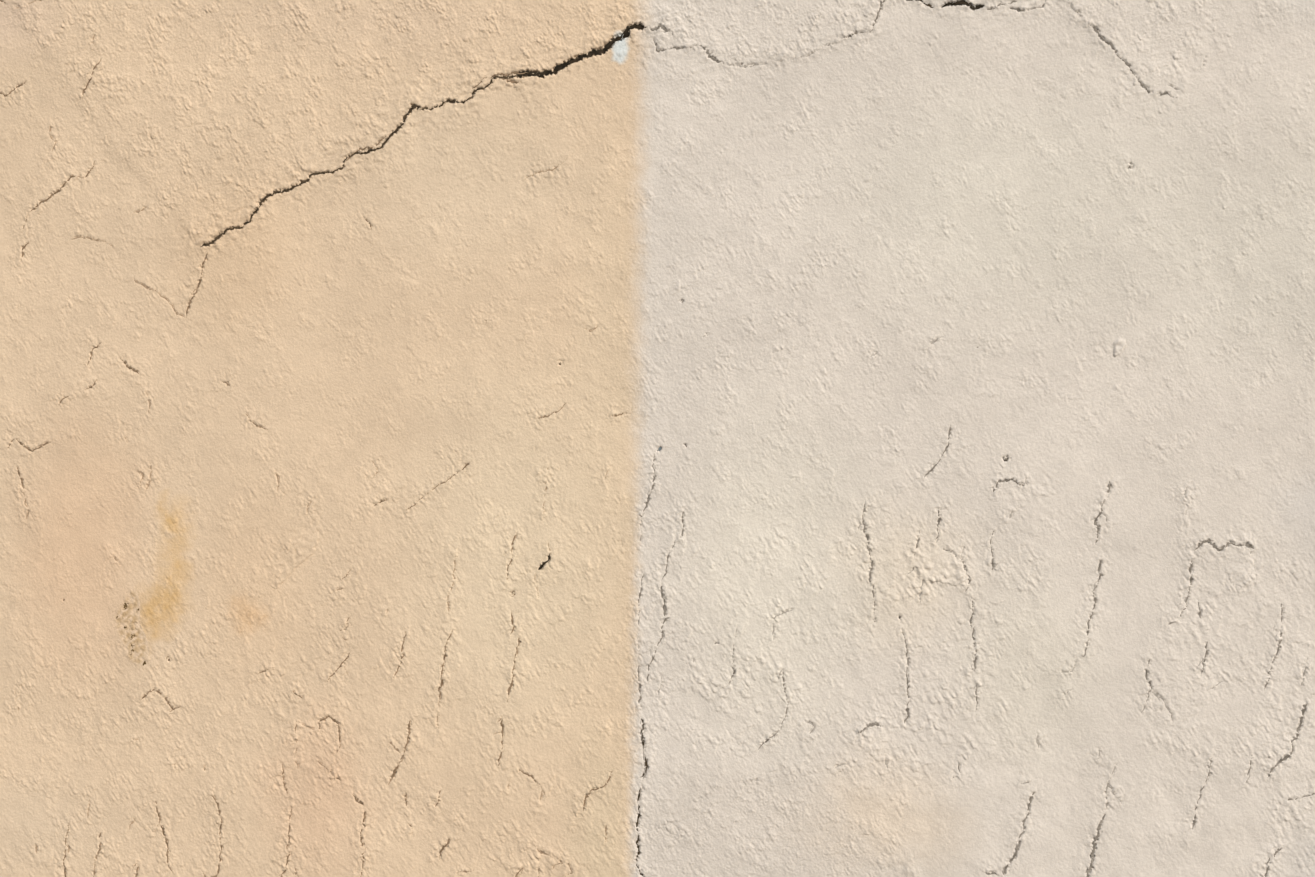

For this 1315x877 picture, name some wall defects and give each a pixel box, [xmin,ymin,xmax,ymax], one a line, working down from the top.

crack [132,0,1206,318]
crack [35,764,222,877]
crack [260,572,366,877]
crack [383,556,456,827]
crack [496,468,550,800]
crack [858,504,875,613]
crack [908,475,1027,715]
crack [984,782,1035,877]
crack [1058,481,1110,693]
crack [1086,750,1122,877]
crack [1168,536,1254,690]
crack [1246,604,1315,800]